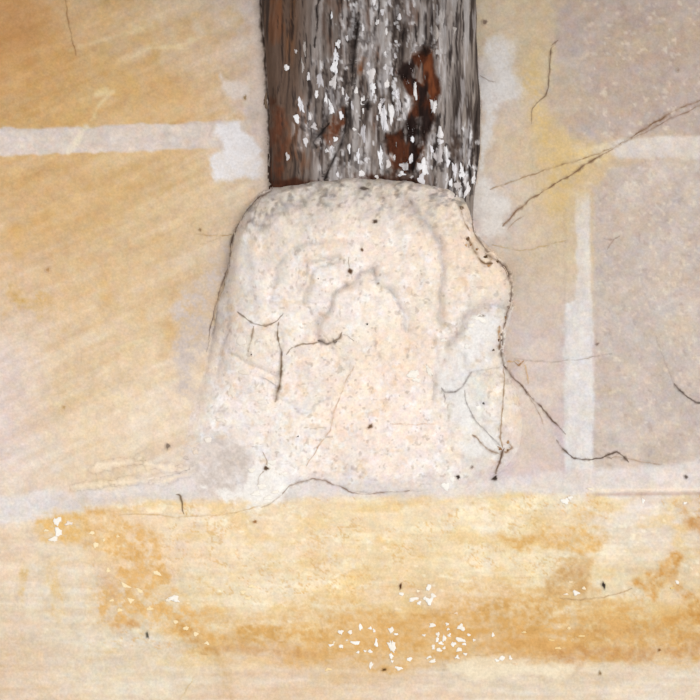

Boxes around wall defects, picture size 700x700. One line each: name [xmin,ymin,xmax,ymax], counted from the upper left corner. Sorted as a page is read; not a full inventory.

peeling [434,8,445,55]
peeling [293,35,407,131]
crack [531,40,559,124]
peeling [347,124,368,176]
peeling [375,19,531,246]
crack [441,100,700,475]
crack [237,311,354,402]
crack [116,362,410,518]